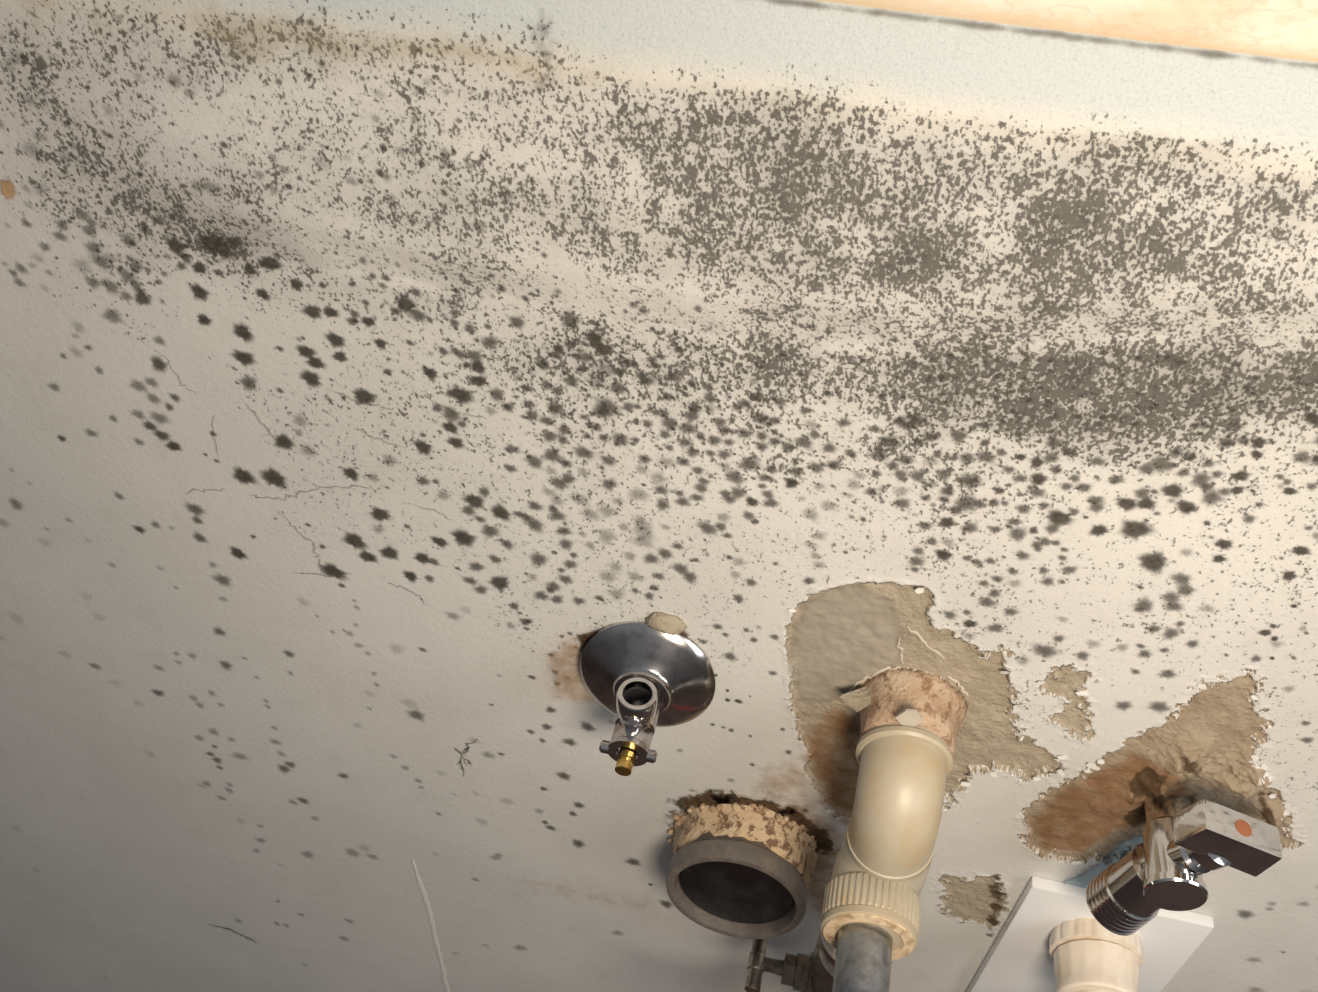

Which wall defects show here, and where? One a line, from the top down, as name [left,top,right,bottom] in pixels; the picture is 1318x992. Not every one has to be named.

water stain [0,0,1318,725]
flaking render [784,581,1304,865]